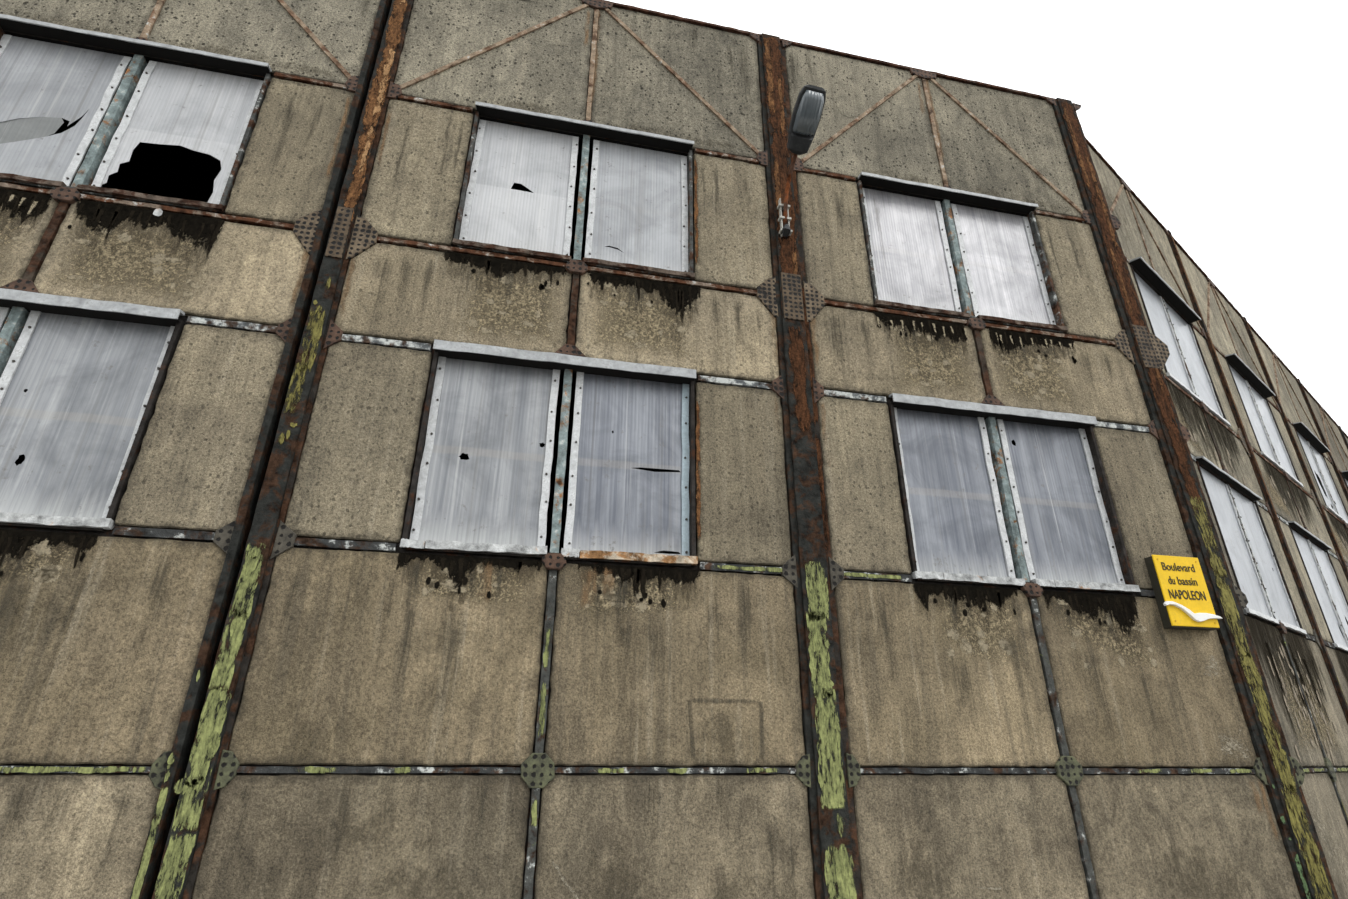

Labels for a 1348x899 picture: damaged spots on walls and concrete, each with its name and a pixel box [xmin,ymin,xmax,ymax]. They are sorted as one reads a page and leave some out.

corrosion [344,0,408,221]
water stain [0,188,52,237]
water stain [67,199,225,268]
corrosion [1061,101,1149,345]
water stain [444,251,567,291]
water stain [587,272,701,327]
corrosion [763,37,829,550]
water stain [864,312,968,353]
corrosion [1144,364,1204,509]
water stain [0,529,99,615]
water stain [914,583,1018,627]
water stain [1043,591,1140,645]